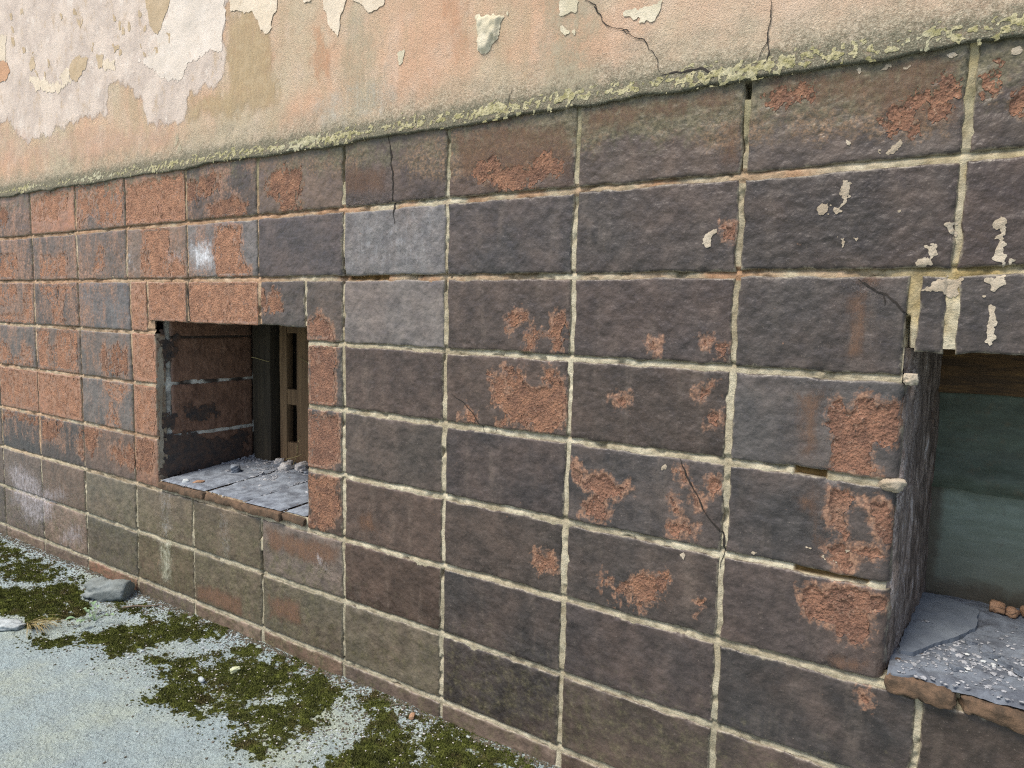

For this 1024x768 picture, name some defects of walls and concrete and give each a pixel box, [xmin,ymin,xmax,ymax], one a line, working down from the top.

peeling [0,0,277,144]
leakage [189,12,274,119]
peeling [303,0,384,36]
peeling [623,0,662,23]
crack [586,0,714,78]
crack [757,1,772,61]
spalling [876,71,963,140]
crack [388,136,396,224]
crack [858,279,908,315]
spalling [825,398,900,475]
crack [680,459,726,567]
spalling [800,489,893,645]